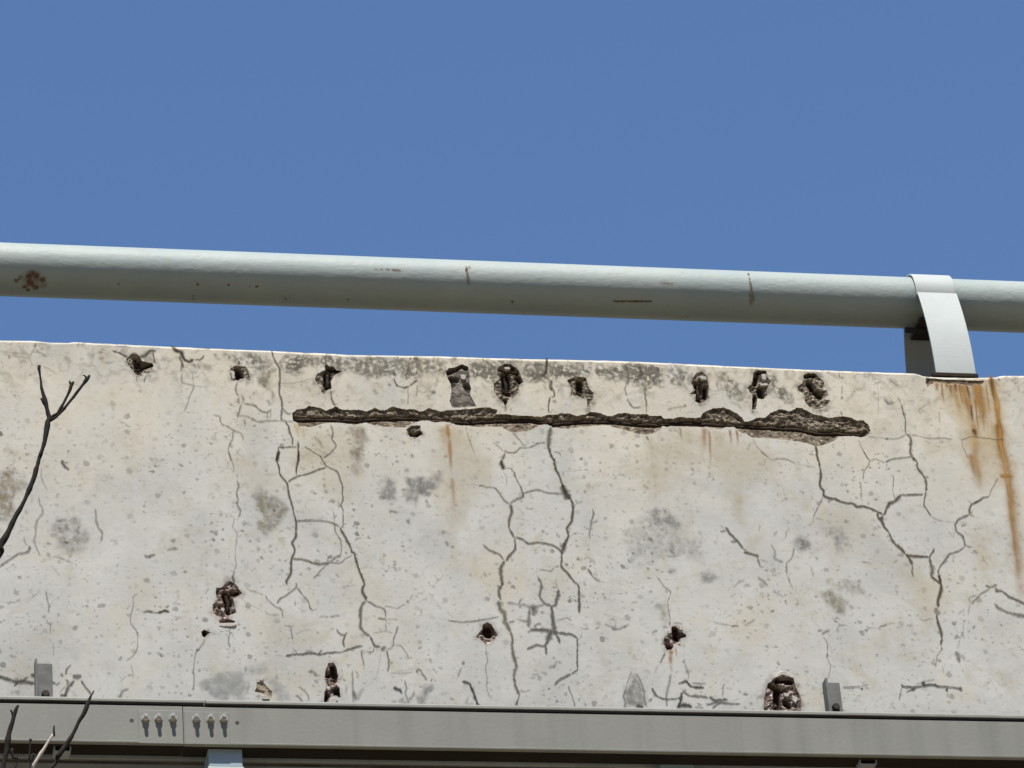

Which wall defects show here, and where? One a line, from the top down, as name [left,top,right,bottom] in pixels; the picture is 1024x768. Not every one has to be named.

spalling [112,349,155,380]
crack [171,346,210,367]
spalling [292,361,871,446]
corrosion [936,377,1014,527]
crack [214,350,427,699]
crack [449,357,595,706]
crack [815,401,997,697]
spalling [201,580,242,637]
crack [982,584,1024,616]
spalling [663,626,686,650]
spalling [324,663,341,702]
spalling [764,670,802,711]